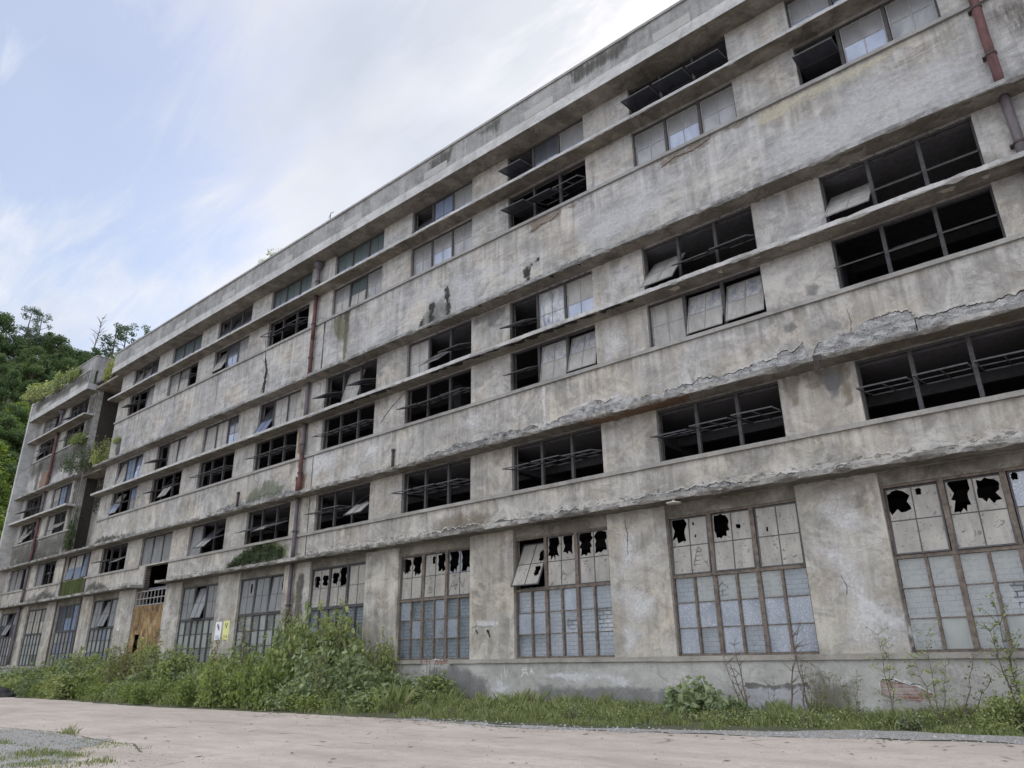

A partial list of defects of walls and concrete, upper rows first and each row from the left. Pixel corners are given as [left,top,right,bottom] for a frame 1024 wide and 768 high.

leakage [419,279,475,327]
leakage [334,311,349,359]
crack [260,342,268,394]
peeling [330,382,404,410]
spalling [414,286,1024,462]
spalling [558,456,908,513]
flaking render [878,678,936,704]